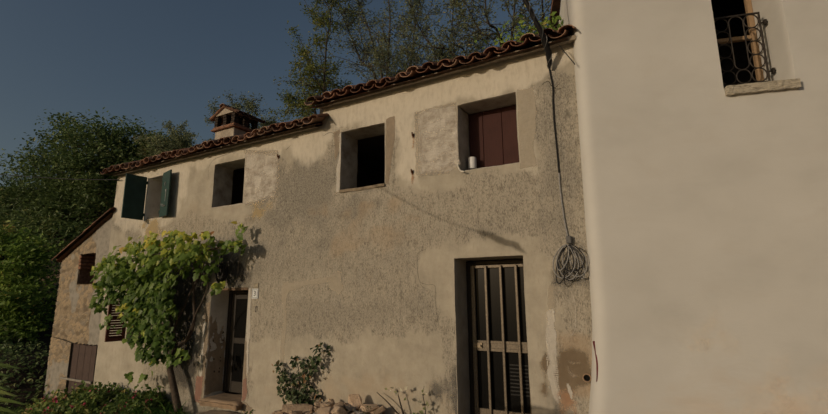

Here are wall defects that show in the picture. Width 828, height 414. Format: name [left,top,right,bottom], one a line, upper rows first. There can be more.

peeling [194,302,226,403]
peeling [545,284,561,403]
water stain [541,348,591,399]